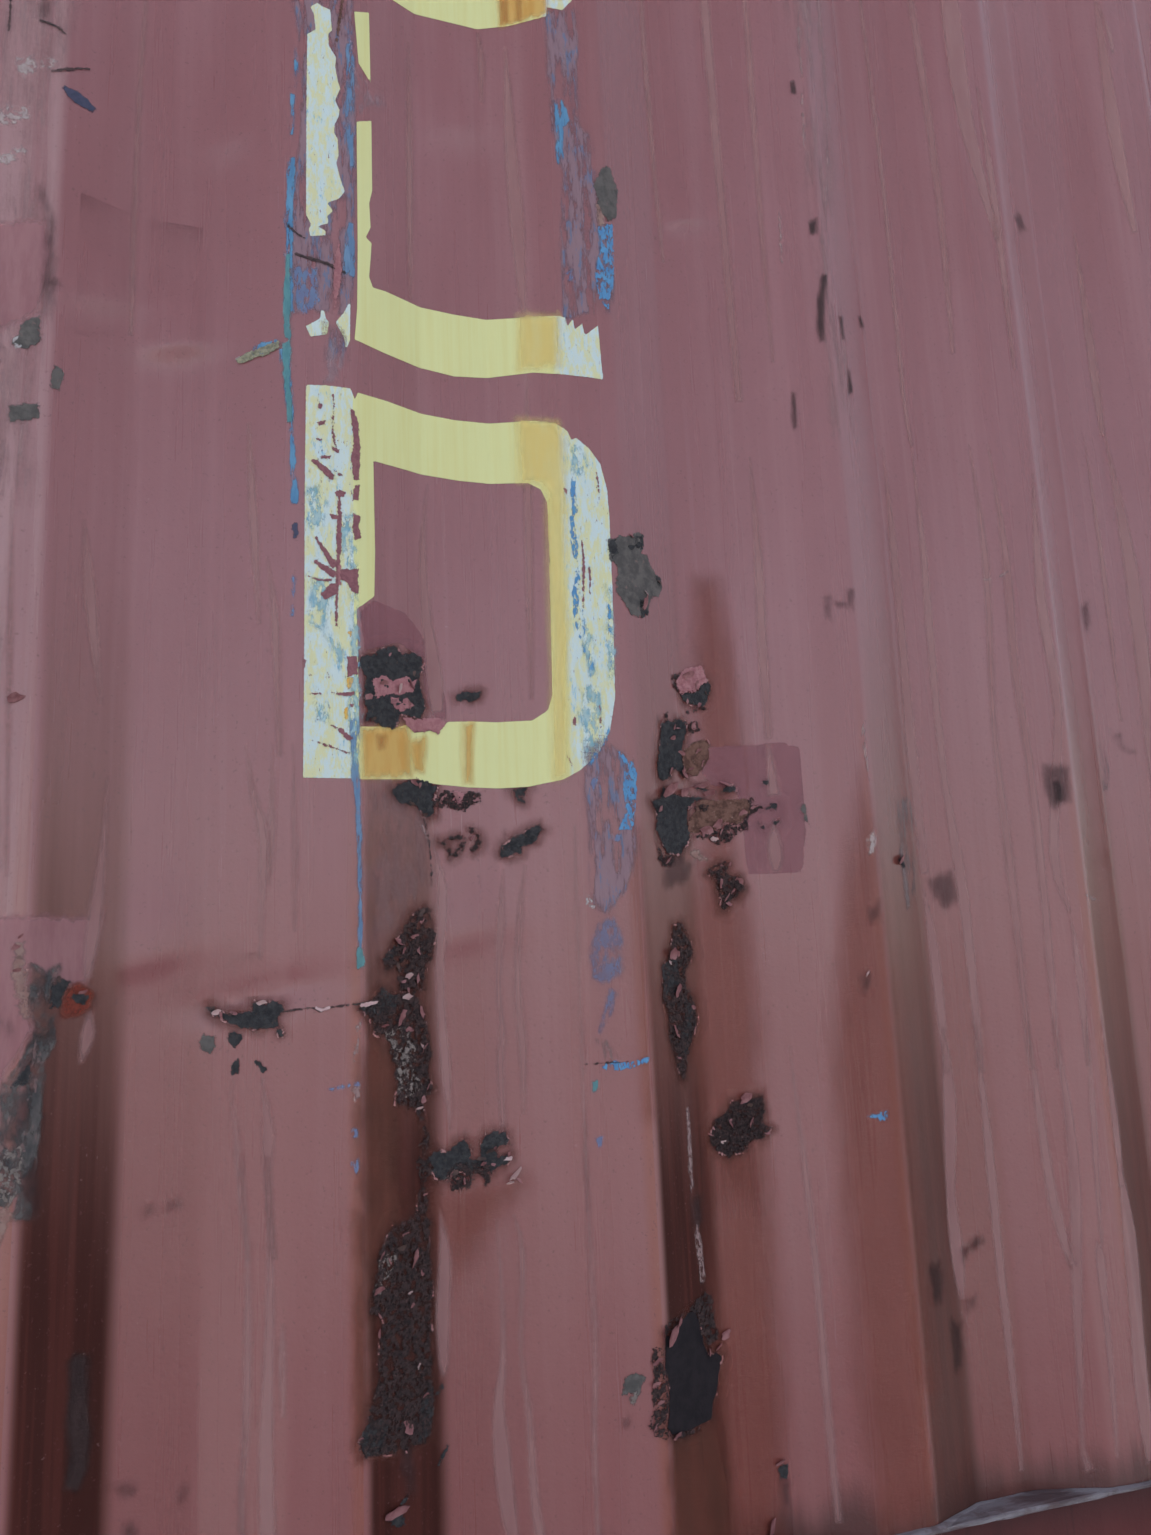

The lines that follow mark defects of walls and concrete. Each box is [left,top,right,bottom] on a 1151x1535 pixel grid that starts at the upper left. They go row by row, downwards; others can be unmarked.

corrosion [500,0,546,26]
corrosion [608,532,662,618]
corrosion [360,645,481,857]
corrosion [657,664,711,781]
corrosion [513,787,527,803]
corrosion [500,824,544,858]
corrosion [688,798,750,833]
corrosion [704,861,746,910]
corrosion [661,923,700,1079]
corrosion [708,1093,772,1159]
corrosion [357,907,522,1459]
corrosion [622,1291,731,1535]